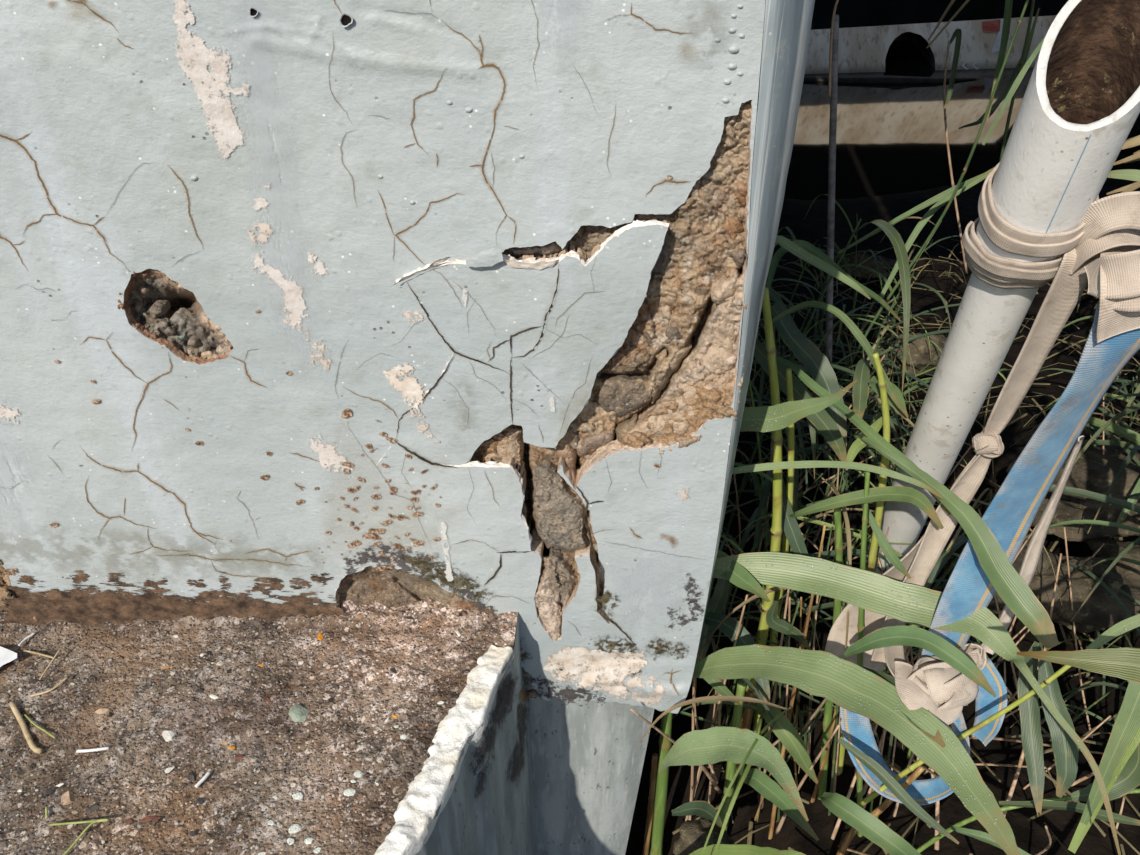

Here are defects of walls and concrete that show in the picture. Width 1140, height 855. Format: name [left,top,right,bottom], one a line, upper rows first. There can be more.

crack [68,0,133,49]
crack [0,133,202,291]
crack [48,333,308,577]
peeling [172,0,249,160]
peeling [248,183,331,371]
crack [389,0,516,244]
crack [329,42,602,609]
spalling [470,94,759,706]
crack [606,4,683,34]
crack [646,179,689,195]
leakage [344,544,495,614]
crack [576,466,698,644]